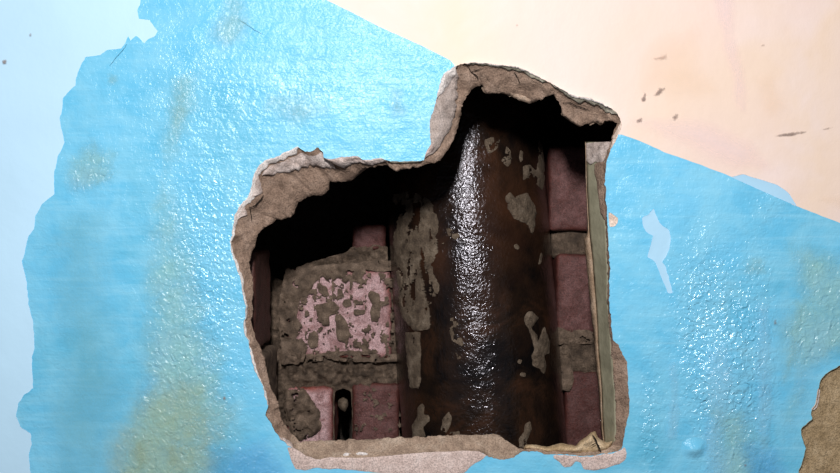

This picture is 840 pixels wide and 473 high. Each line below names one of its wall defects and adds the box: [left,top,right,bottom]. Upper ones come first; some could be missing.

flaking render [230,62,630,473]
peeling [642,209,673,293]
flaking render [799,366,840,473]